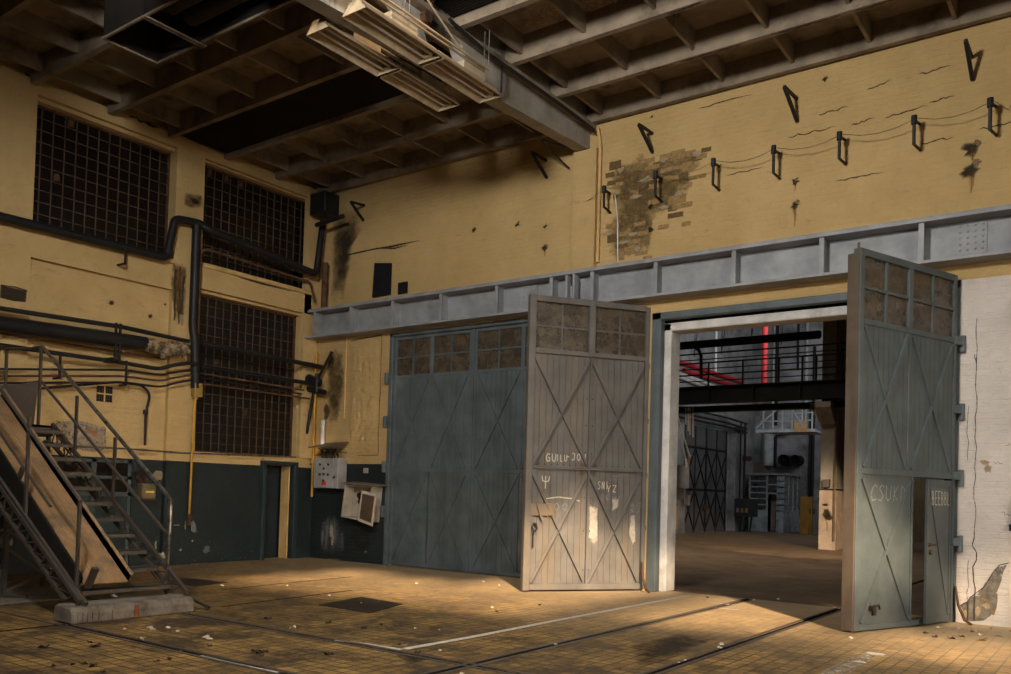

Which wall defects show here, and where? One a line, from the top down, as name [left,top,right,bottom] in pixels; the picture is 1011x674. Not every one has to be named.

crack [788,96,952,138]
flaking render [602,146,711,261]
crack [966,320,1009,599]
flaking render [960,563,1008,621]